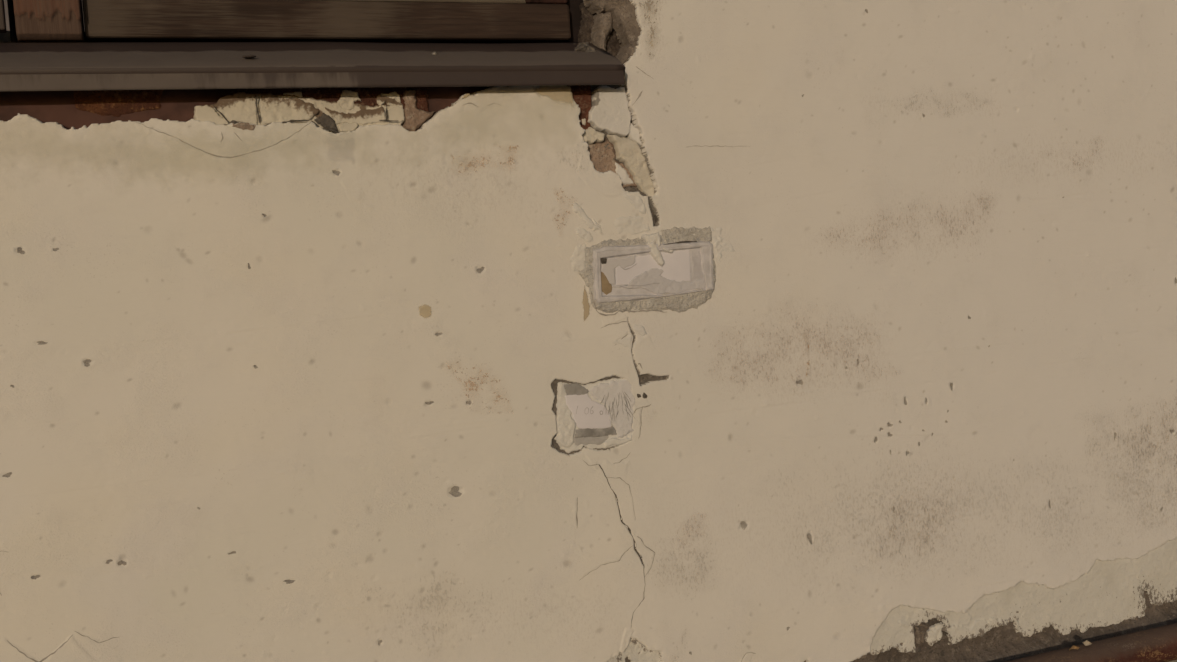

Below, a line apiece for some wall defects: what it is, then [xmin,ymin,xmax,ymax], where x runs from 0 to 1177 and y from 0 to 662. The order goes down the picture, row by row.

flaking render [574,0,641,64]
flaking render [0,86,487,134]
flaking render [567,85,654,243]
crack [627,186,658,226]
crack [580,292,667,624]
flaking render [871,538,1177,655]
flaking render [607,638,661,662]